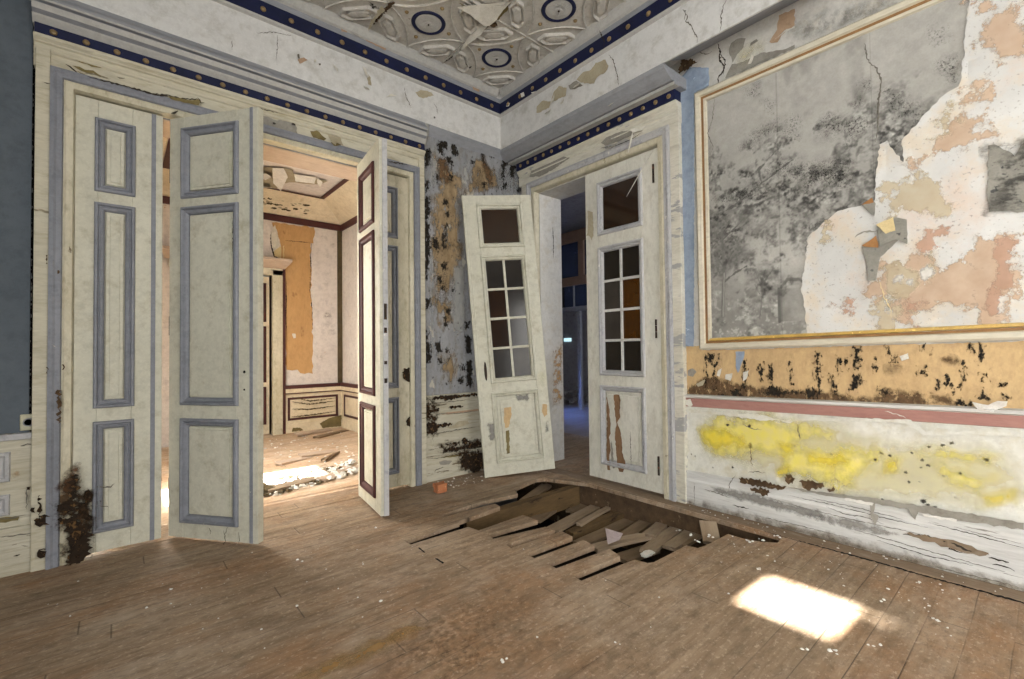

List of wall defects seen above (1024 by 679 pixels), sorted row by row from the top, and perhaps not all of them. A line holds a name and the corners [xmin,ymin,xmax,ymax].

peeling [457,2,511,50]
peeling [520,60,608,114]
crack [684,1,726,159]
crack [865,45,882,140]
peeling [263,167,327,214]
peeling [862,198,908,281]
leakage [687,342,1012,406]
spalling [426,393,529,473]
leakage [701,416,875,484]
spalling [27,466,112,566]
peeling [705,474,1024,534]